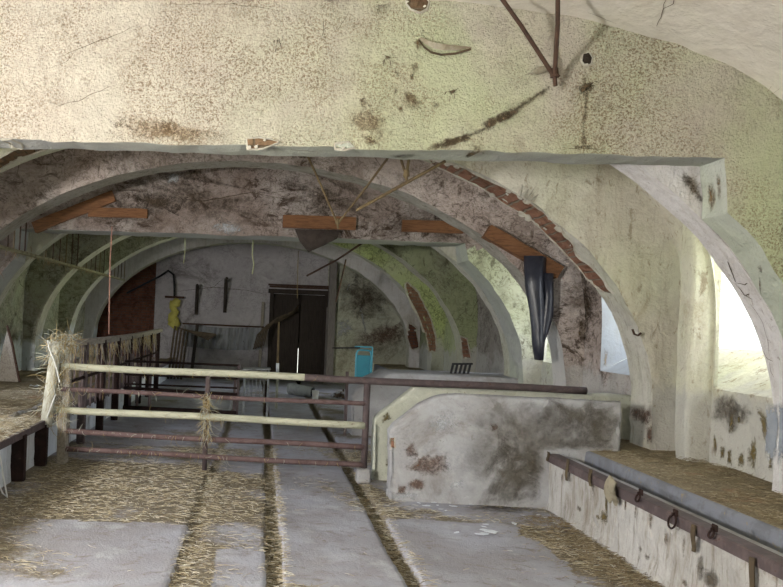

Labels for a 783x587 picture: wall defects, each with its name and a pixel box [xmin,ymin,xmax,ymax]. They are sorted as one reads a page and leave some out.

peeling [419,37,471,56]
damp [395,89,420,110]
damp [431,87,549,157]
flaking render [0,139,48,170]
flaking render [246,136,280,151]
damp [169,170,241,188]
flaking render [428,159,614,294]
flaking render [404,282,437,353]
damp [716,397,745,428]